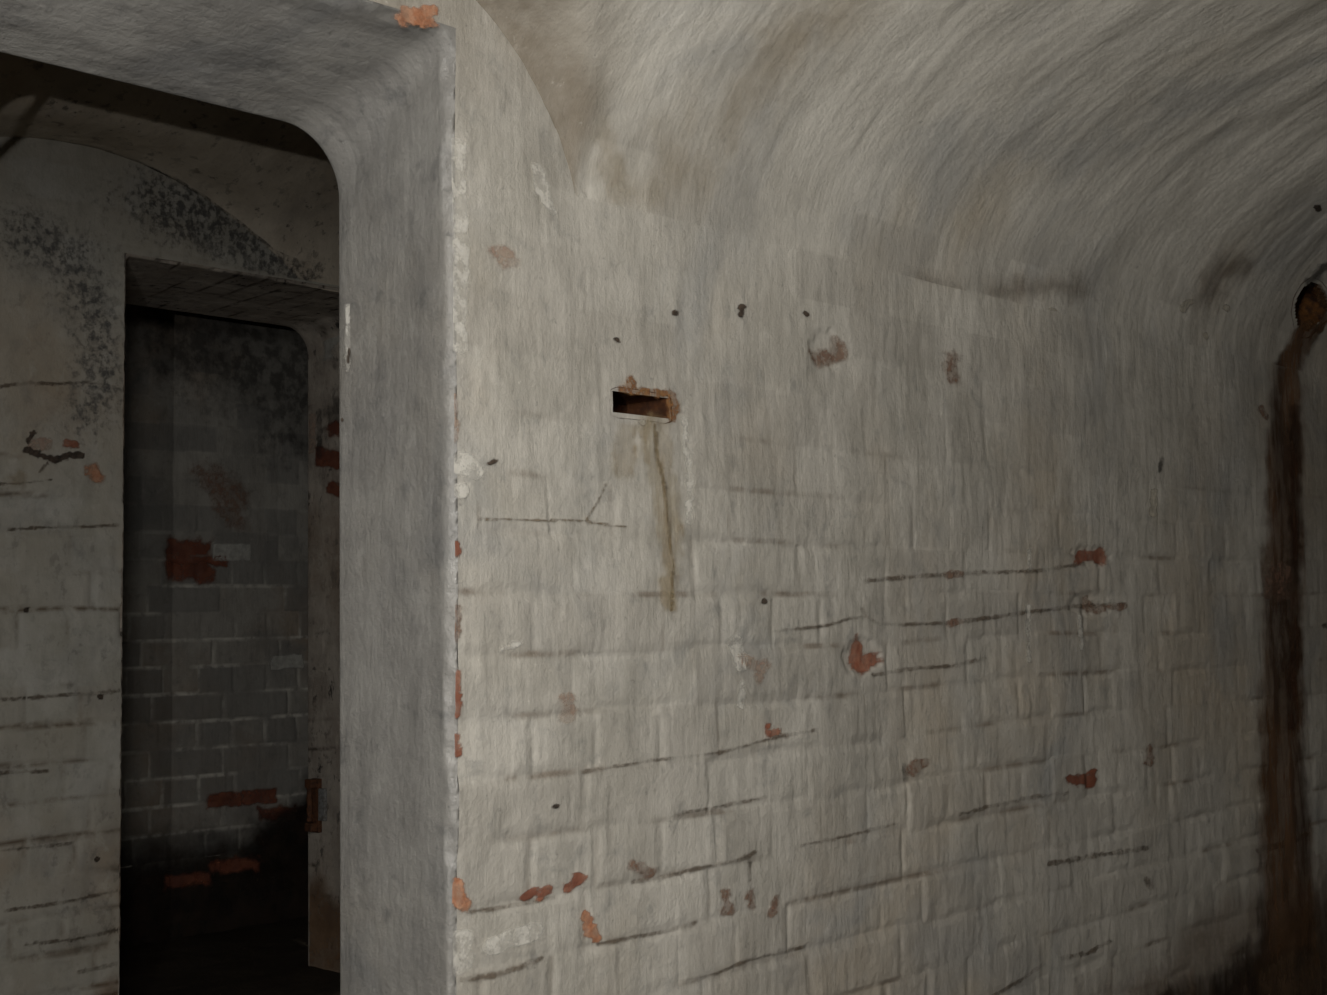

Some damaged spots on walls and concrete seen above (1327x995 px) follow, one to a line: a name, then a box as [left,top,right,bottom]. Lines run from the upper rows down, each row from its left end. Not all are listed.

flaking render [395,5,438,28]
mould [126,168,313,280]
water stain [6,218,114,419]
flaking render [309,414,339,497]
flaking render [166,537,251,584]
flaking render [1074,547,1106,565]
flaking render [849,634,883,674]
rust [1257,321,1318,995]
flaking render [207,788,296,821]
water stain [120,800,340,969]
flaking render [520,872,588,901]
flaking render [581,910,602,943]